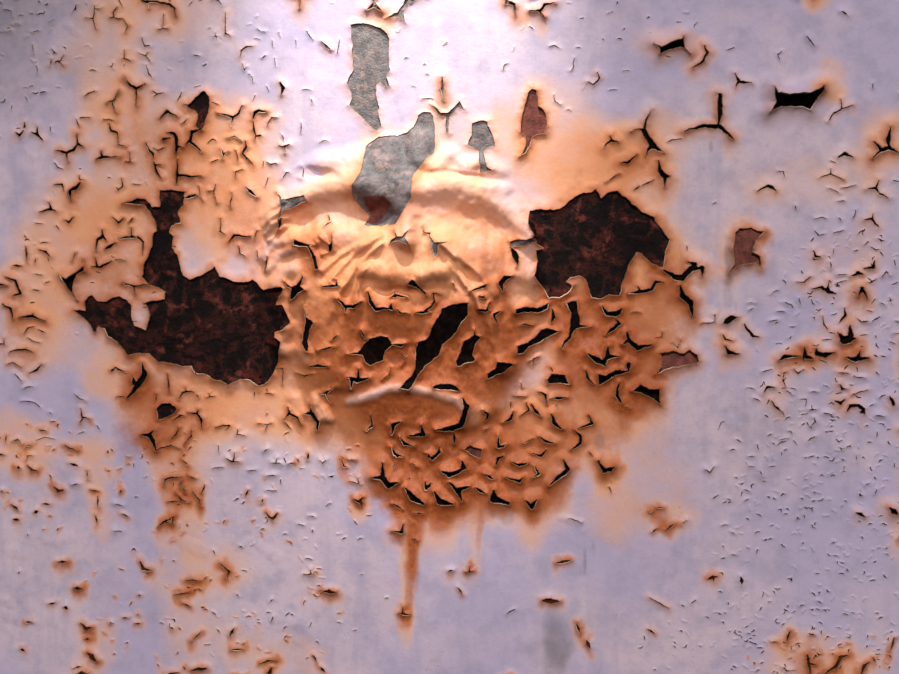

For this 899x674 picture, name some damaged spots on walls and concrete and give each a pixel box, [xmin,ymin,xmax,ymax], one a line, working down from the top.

crack [488,0,571,47]
crack [588,29,790,205]
peeling [745,63,848,138]
rust [66,430,119,497]
crack [0,0,301,414]
peeling [46,179,343,407]
crack [24,92,899,614]
peeling [331,0,705,404]
rust [569,385,689,447]
peeling [715,209,783,332]
rust [141,511,337,674]
rust [388,484,582,608]